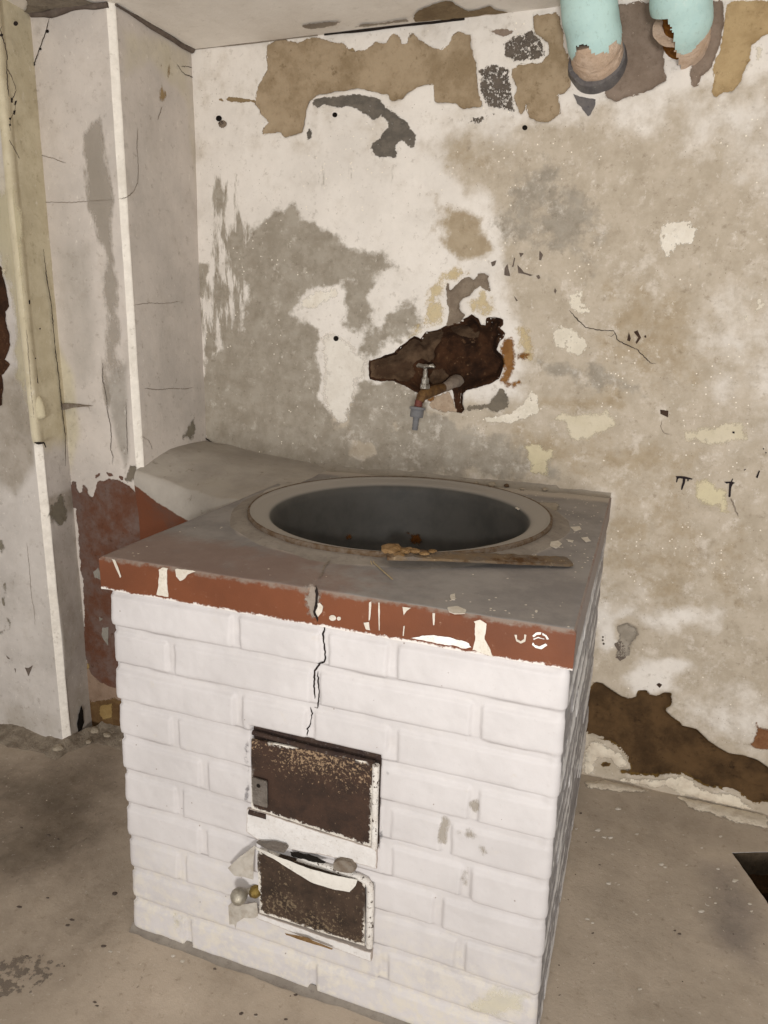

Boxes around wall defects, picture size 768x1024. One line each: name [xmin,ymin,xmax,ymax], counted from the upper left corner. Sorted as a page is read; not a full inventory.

flaking render [255,31,483,138]
flaking render [511,12,571,122]
flaking render [690,0,768,97]
damp [84,122,119,404]
spalling [368,253,540,413]
crack [569,310,655,364]
crack [307,560,330,735]
spalling [602,623,639,661]
damp [584,741,768,831]